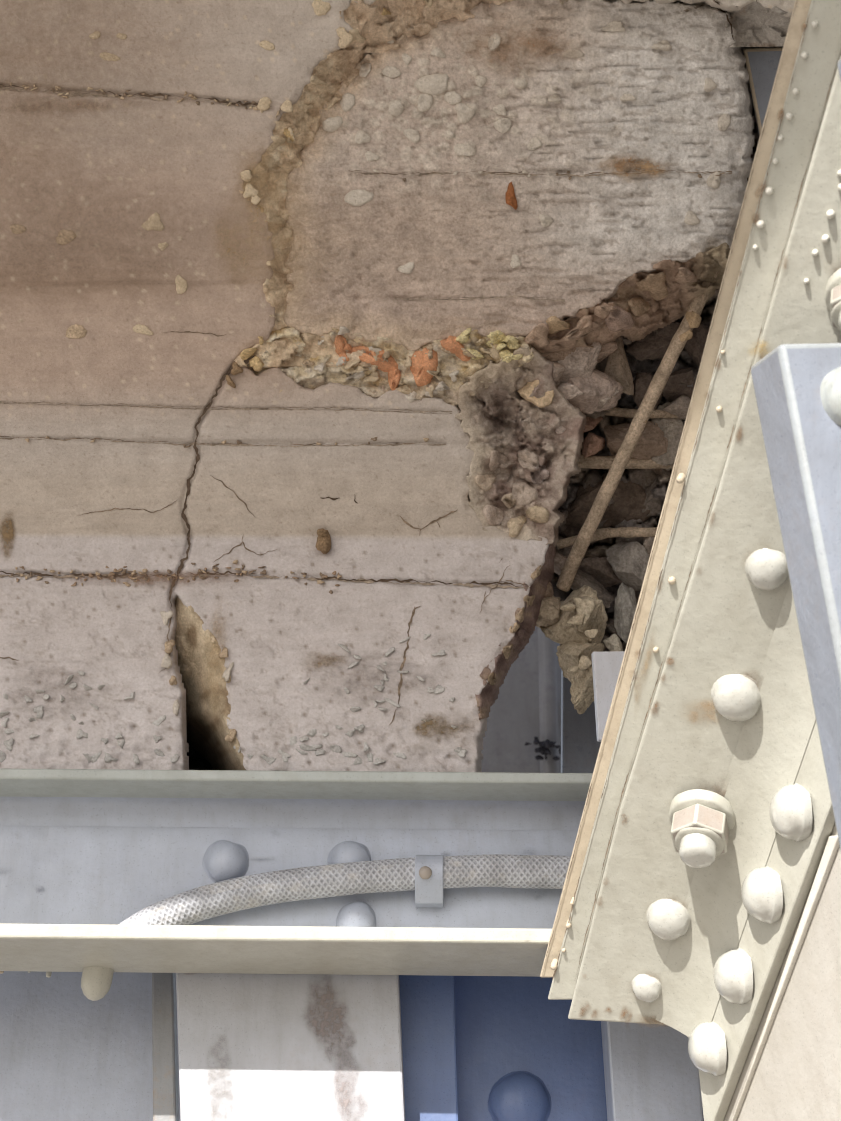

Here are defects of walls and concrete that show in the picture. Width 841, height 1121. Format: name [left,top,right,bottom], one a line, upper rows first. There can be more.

spalling [164,0,791,720]
crack [85,331,277,770]
peeling [70,714,140,764]
peeling [233,634,455,765]
crack [389,606,420,725]
damp [336,1067,352,1115]